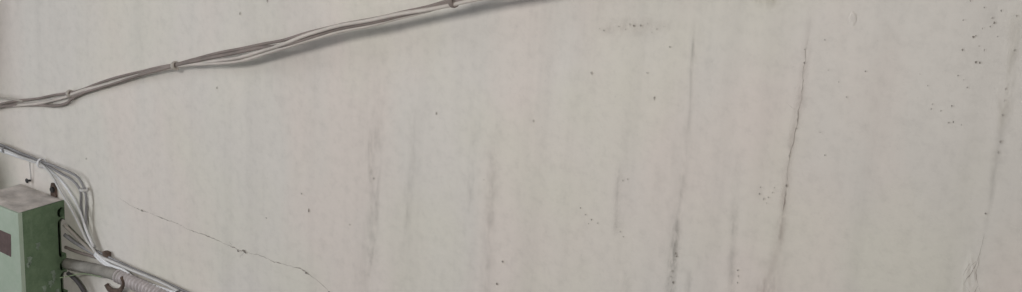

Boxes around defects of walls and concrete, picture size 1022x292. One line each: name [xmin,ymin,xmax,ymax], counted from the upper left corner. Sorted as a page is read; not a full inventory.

crack [124,201,330,292]